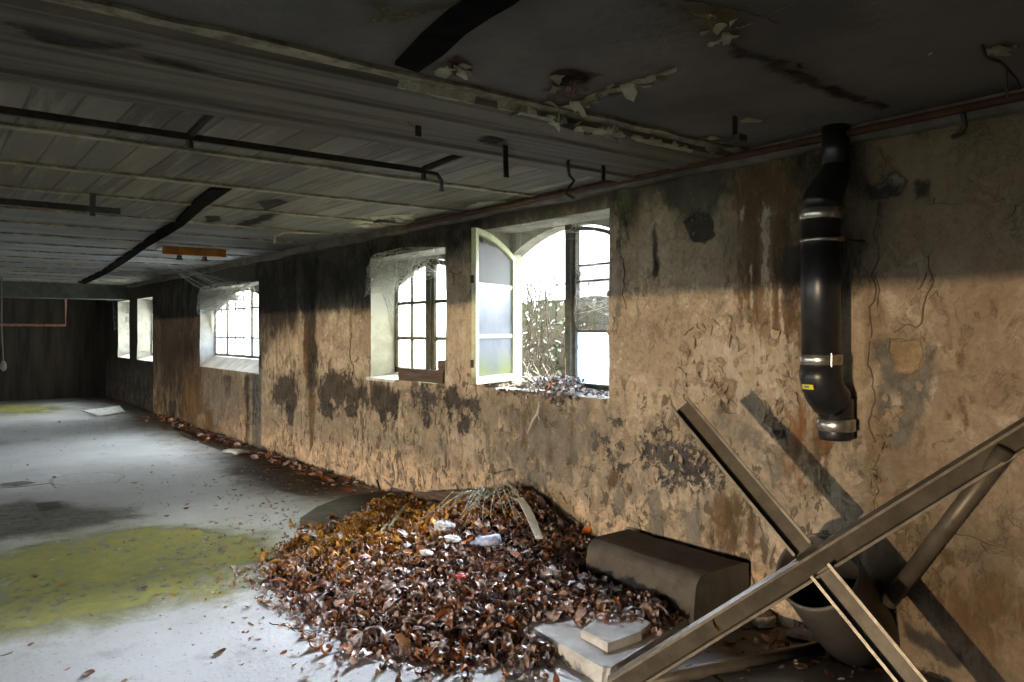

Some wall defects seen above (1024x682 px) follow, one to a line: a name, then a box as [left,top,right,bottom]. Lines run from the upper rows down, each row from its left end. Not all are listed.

peeling [397,55,476,104]
peeling [496,67,693,153]
water stain [663,2,889,109]
peeling [684,213,715,244]
water stain [663,152,821,386]
water stain [270,324,631,513]
peeling [638,419,725,495]
peeling [674,314,800,440]
crack [867,205,943,510]